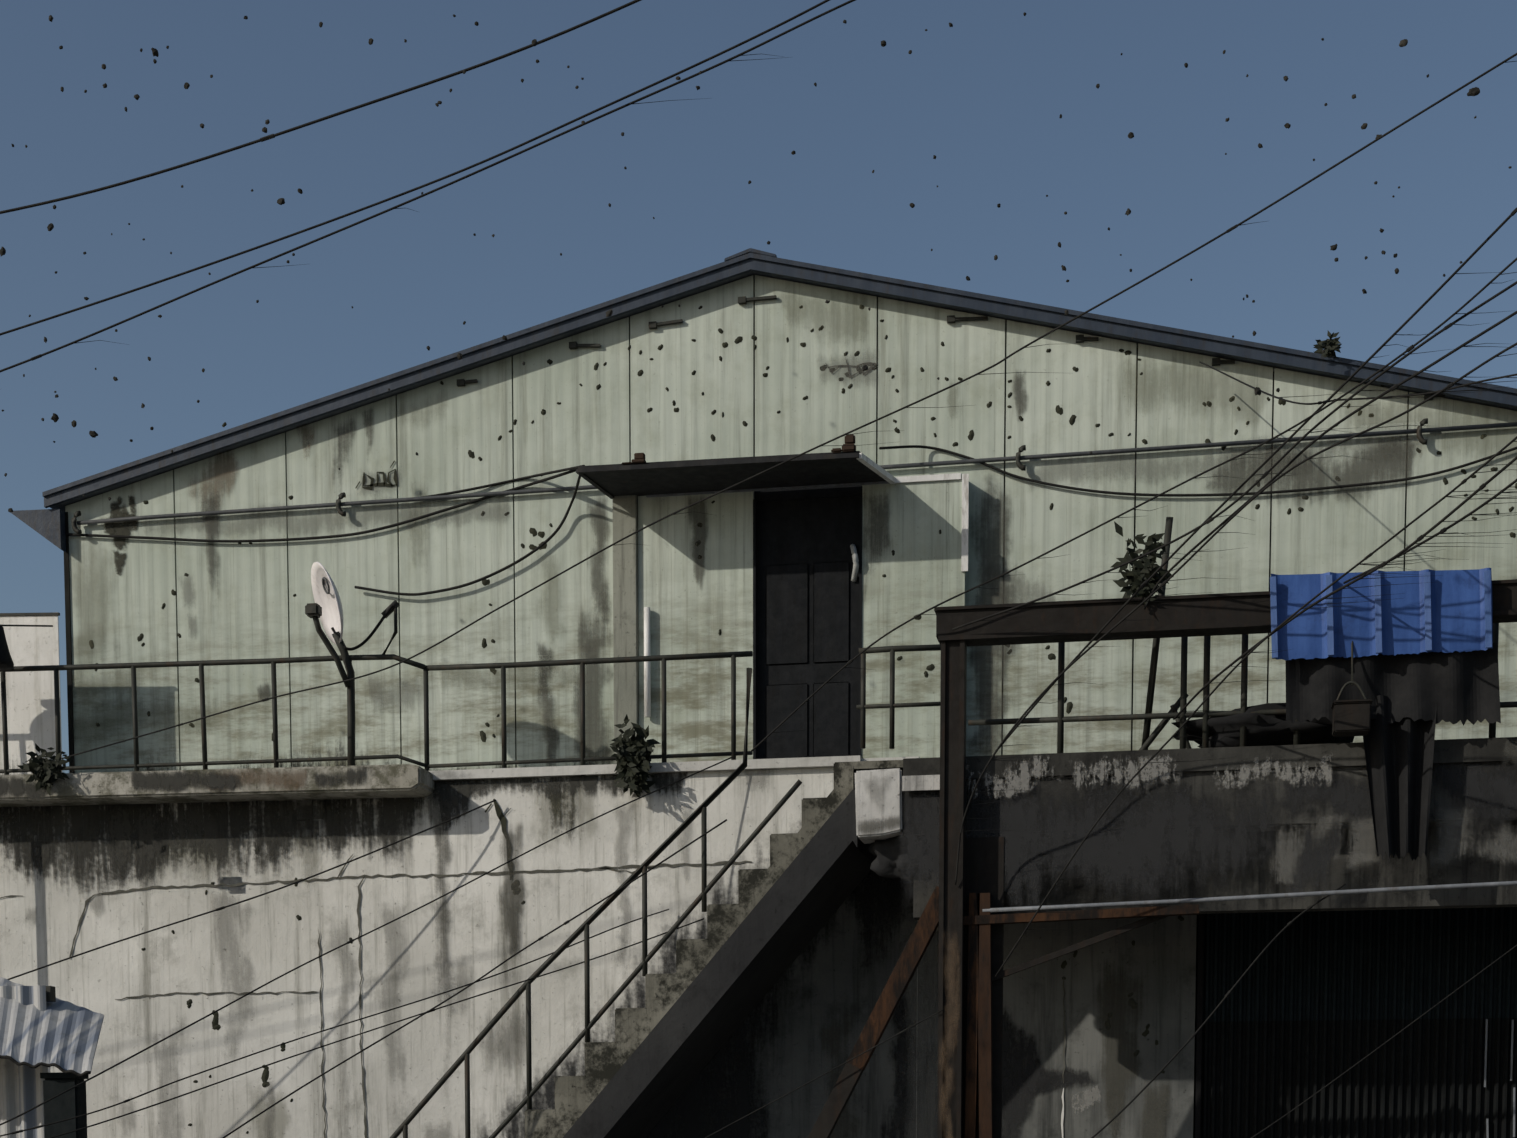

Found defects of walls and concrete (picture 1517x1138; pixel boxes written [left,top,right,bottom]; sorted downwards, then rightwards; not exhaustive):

damp [689,499,715,583]
damp [0,496,624,955]
damp [652,772,687,795]
peeling [969,757,1053,797]
peeling [1075,756,1175,787]
peeling [1217,757,1332,787]
damp [853,870,913,966]
corrosion [847,886,939,1070]
damp [881,996,916,1138]